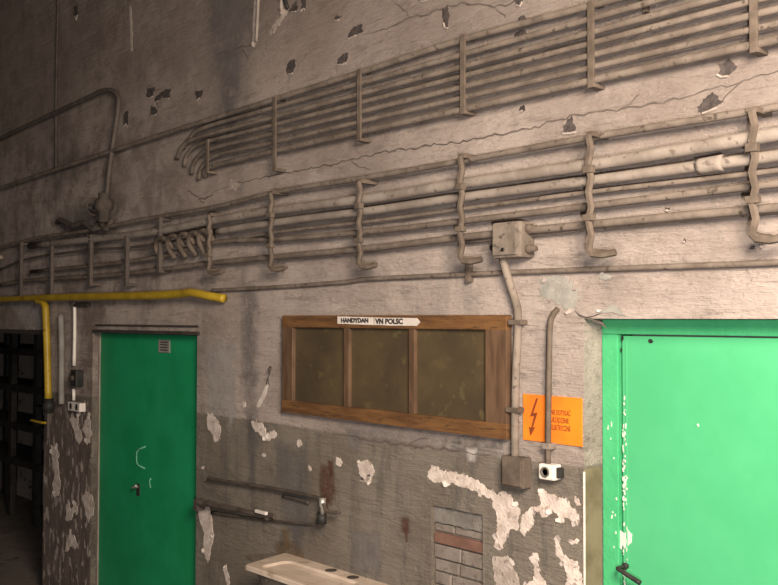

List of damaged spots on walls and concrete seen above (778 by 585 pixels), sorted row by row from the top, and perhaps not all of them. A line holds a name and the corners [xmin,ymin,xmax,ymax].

spalling [347,24,364,40]
crack [364,1,515,35]
spalling [442,4,450,29]
spalling [146,86,171,116]
crack [188,70,778,204]
spalling [562,116,576,135]
peeling [69,412,92,445]
peeling [251,420,277,441]
peeling [50,443,94,552]
rust [321,461,334,508]
peeling [357,460,375,486]
peeling [427,465,583,585]